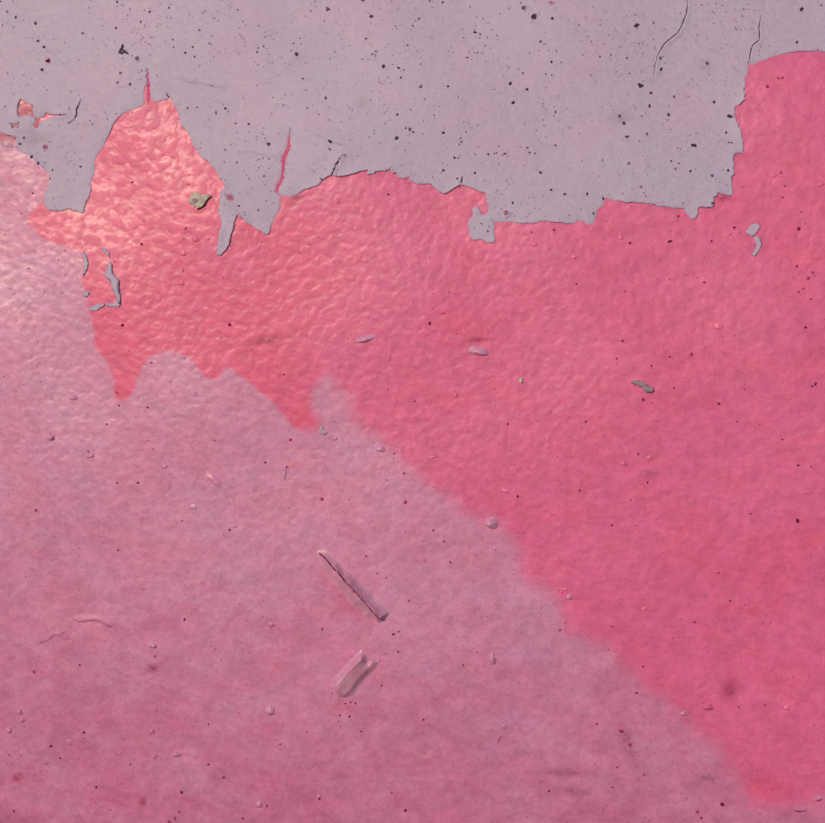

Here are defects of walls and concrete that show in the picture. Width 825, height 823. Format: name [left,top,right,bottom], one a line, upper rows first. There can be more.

crack [653,0,693,79]
crack [748,15,767,65]
peeling [0,100,64,176]
spalling [188,192,211,209]
peeling [745,223,760,237]
peeling [752,236,762,256]
peeling [104,261,121,305]
peeling [631,380,654,392]